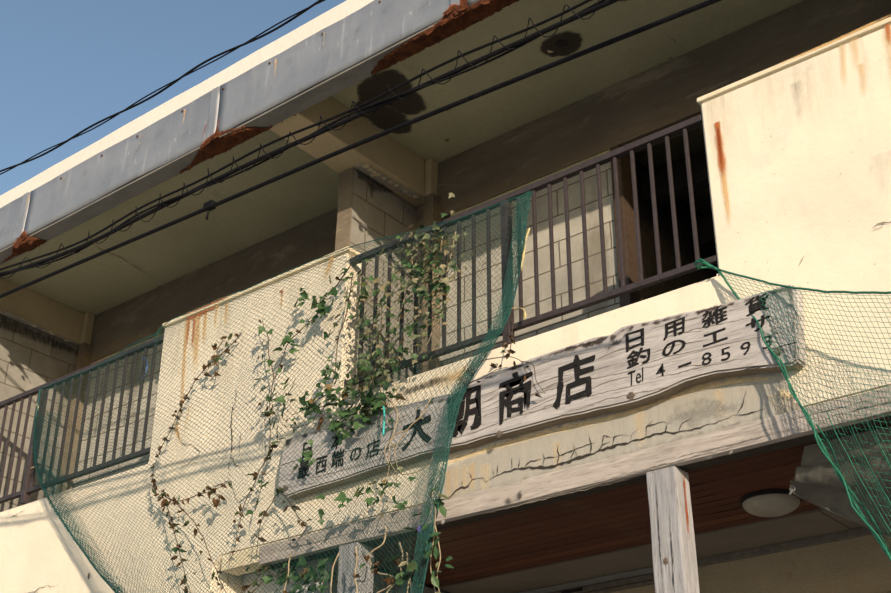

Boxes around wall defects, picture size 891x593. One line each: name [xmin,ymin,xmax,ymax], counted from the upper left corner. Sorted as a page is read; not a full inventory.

corrosion [714,122,729,212]
corrosion [181,296,228,395]
crack [446,394,766,499]